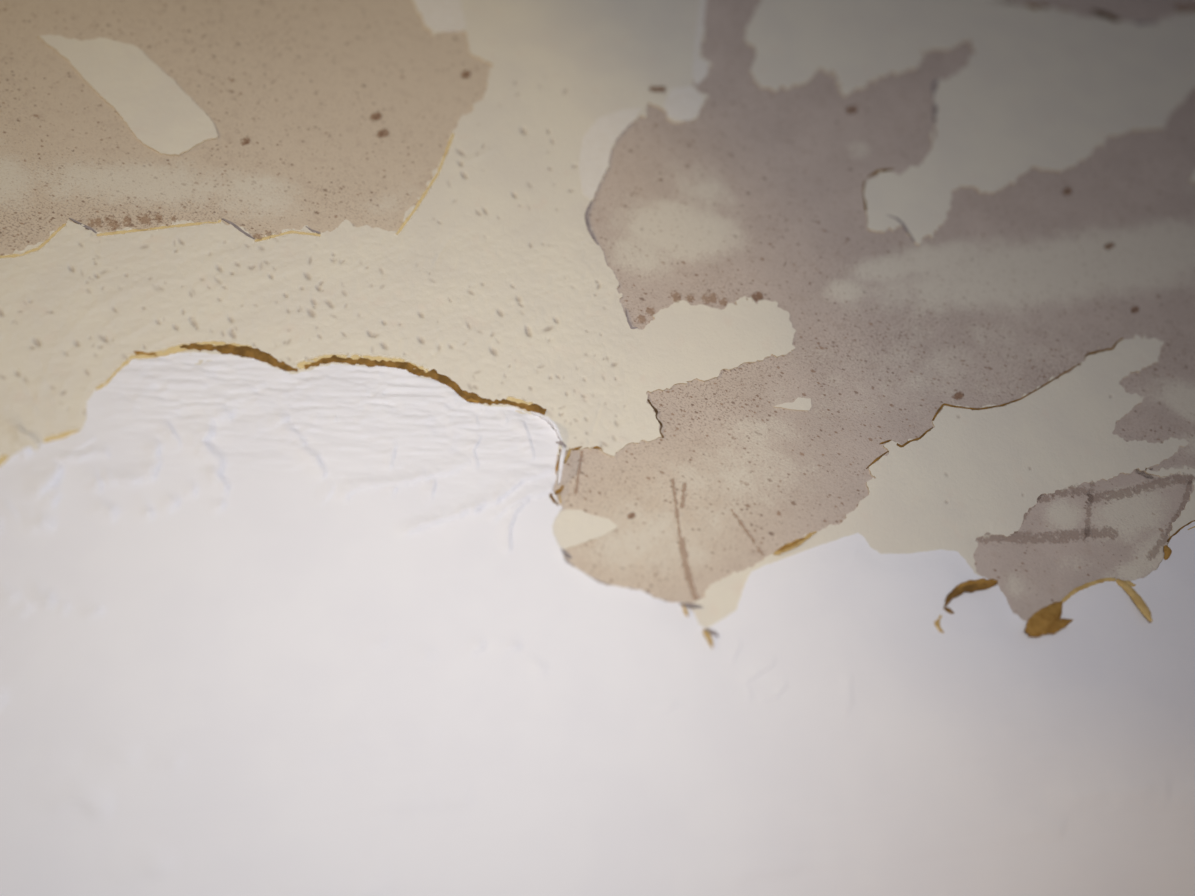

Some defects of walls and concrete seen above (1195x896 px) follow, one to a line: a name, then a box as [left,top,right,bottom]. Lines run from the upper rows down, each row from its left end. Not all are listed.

peeling [0,0,493,258]
peeling [531,0,1195,621]